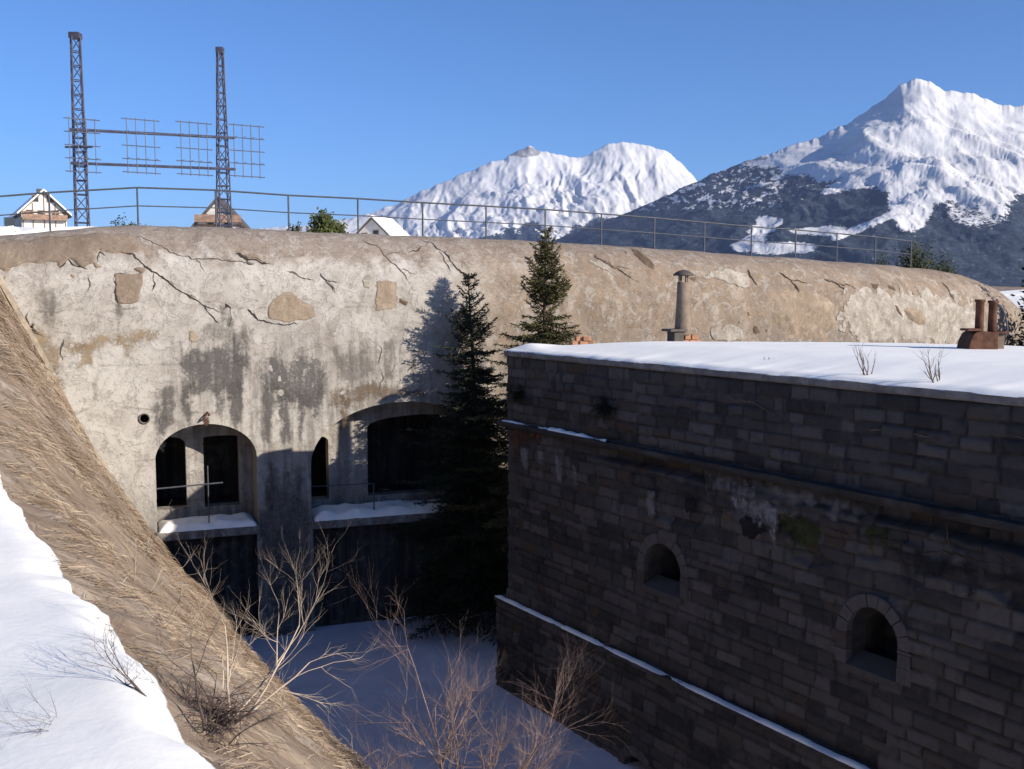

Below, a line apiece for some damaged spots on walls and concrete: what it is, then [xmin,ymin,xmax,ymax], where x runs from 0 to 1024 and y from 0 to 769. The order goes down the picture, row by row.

crack [60,238,335,325]
crack [362,239,468,285]
crack [748,270,858,292]
water stain [155,338,249,435]
spalling [722,510,765,540]
water stain [731,497,776,540]